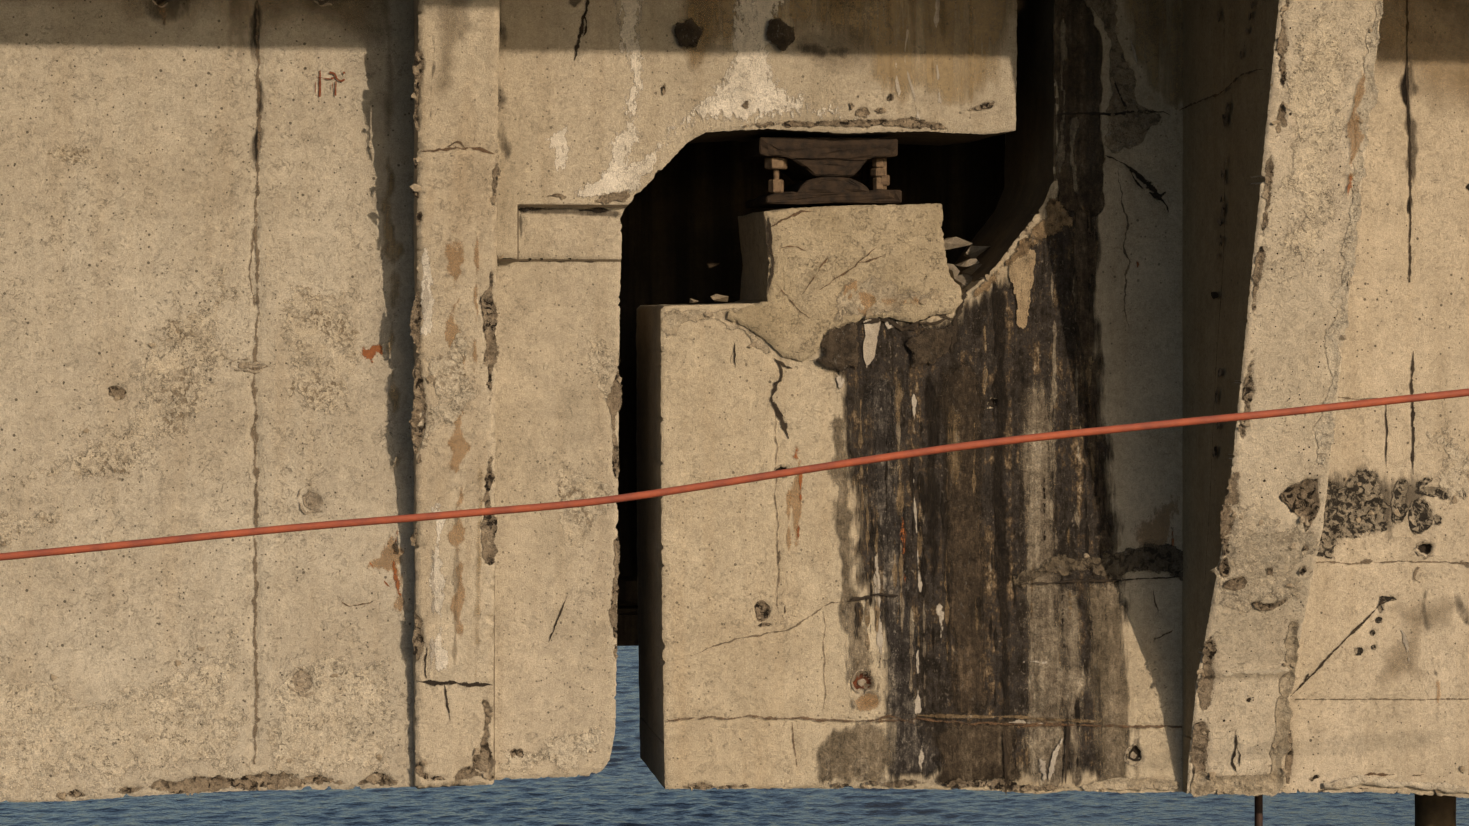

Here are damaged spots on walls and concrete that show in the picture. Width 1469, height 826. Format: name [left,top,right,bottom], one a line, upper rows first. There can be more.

crack [1055,69,1262,116]
spalling [409,287,435,463]
spalling [479,254,504,405]
leakage [818,0,1130,788]
spalling [973,198,1073,329]
crack [1104,155,1169,326]
corrosion [369,561,401,596]
spalling [480,456,498,565]
crack [668,358,1182,794]
spalling [1213,472,1320,614]
crack [1221,559,1469,700]
peeling [0,629,399,800]